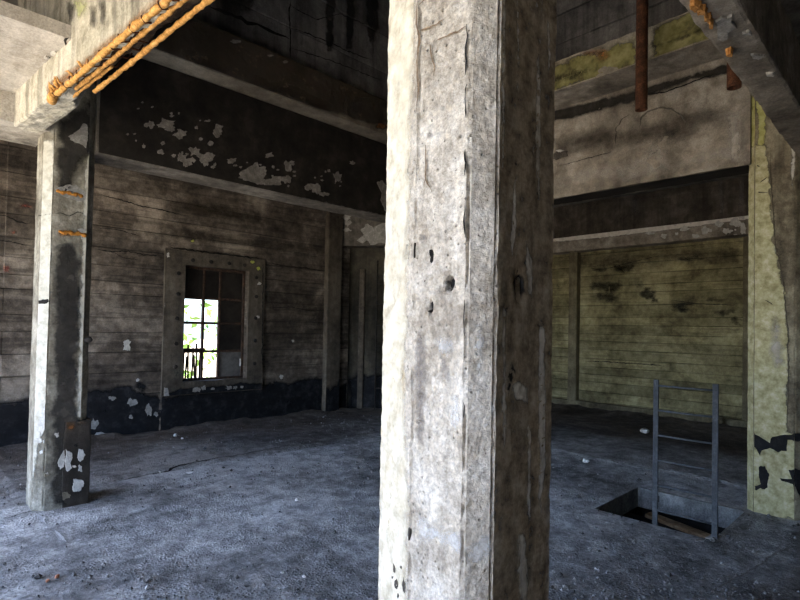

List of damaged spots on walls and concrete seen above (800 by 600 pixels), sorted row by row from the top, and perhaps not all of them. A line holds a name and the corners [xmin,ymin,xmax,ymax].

rust [47,37,116,93]
spalling [68,123,88,148]
peeling [144,112,223,169]
peeling [227,152,296,187]
peeling [343,215,386,245]
leakage [0,100,322,504]
leakage [479,0,794,600]
peeling [127,398,158,419]
peeling [754,431,800,457]
peeling [58,449,85,500]
peeling [755,466,769,490]
peeling [780,468,800,496]